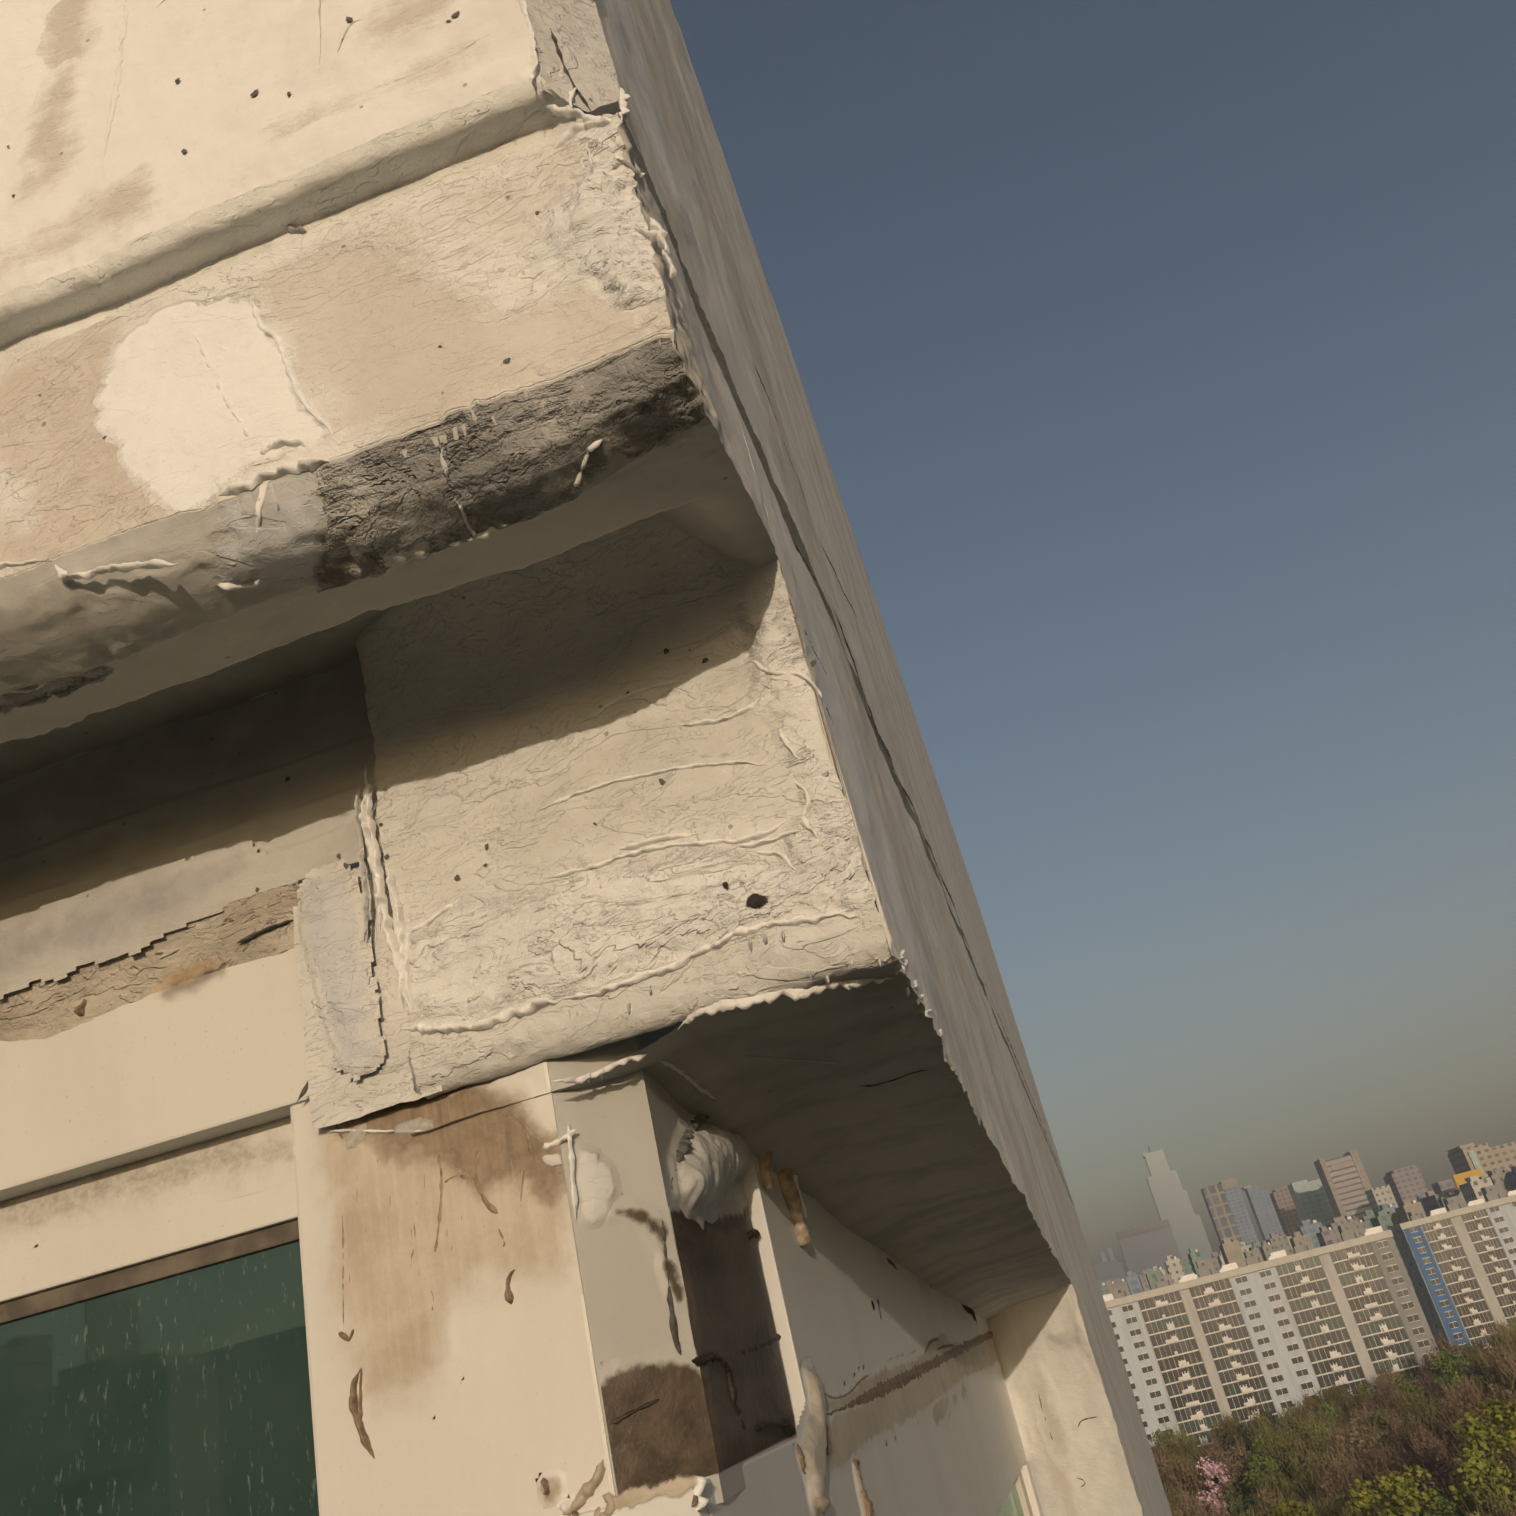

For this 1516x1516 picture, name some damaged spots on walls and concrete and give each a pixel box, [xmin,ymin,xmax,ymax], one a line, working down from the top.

peeling [221,213,707,592]
spalling [0,663,122,708]
crack [752,361,1075,1207]
water stain [0,1069,583,1434]
peeling [542,1124,578,1219]
peeling [691,1476,709,1511]